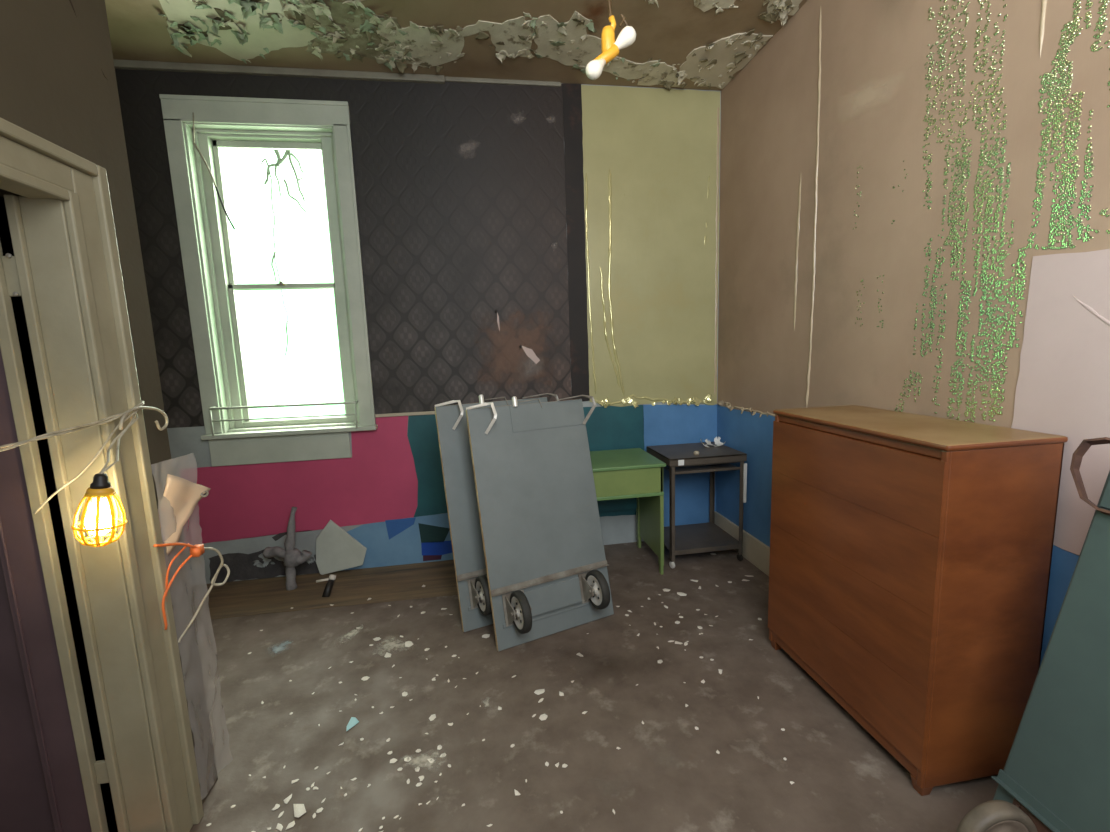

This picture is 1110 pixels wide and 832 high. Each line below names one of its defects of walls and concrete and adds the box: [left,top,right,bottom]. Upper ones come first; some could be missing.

peeling [158,0,802,91]
peeling [596,393,775,418]
flaking render [1011,249,1110,555]